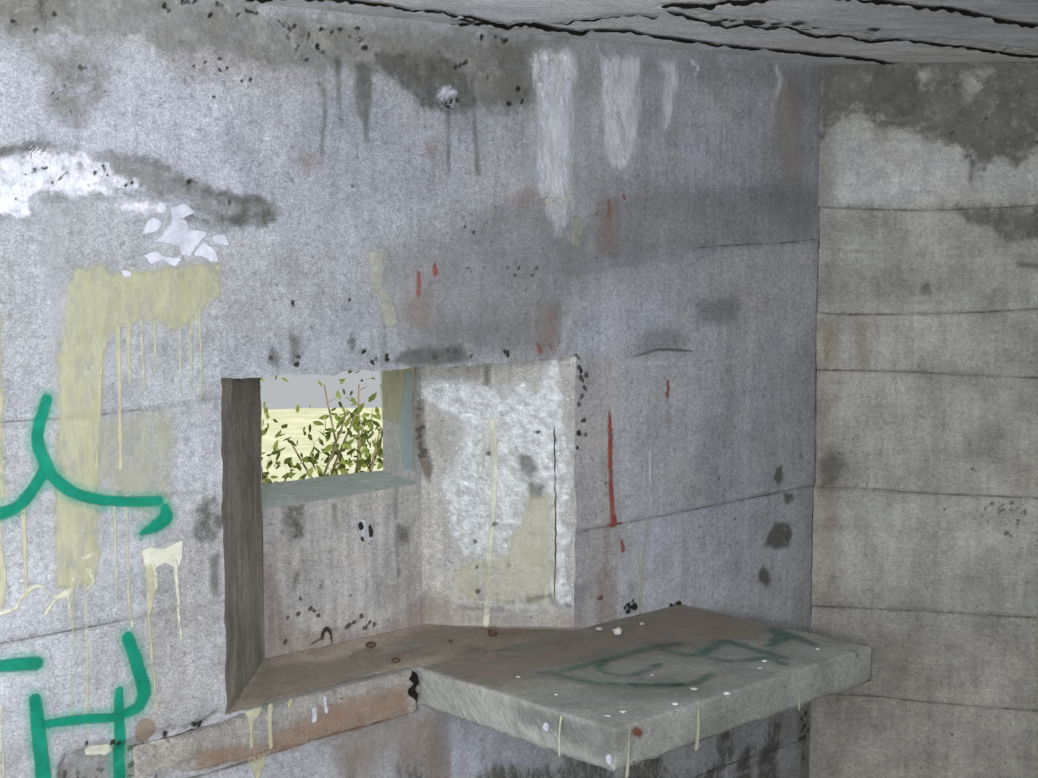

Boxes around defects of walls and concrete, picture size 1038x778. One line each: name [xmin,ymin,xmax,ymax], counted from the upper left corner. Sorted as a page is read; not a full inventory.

crack [246,0,1038,65]
spalling [0,142,50,161]
damp [0,147,166,218]
peeling [78,158,275,266]
damp [375,51,475,110]
damp [530,48,576,235]
damp [600,54,640,172]
damp [660,60,679,129]
damp [820,61,1038,171]
damp [956,205,1038,239]
damp [487,757,662,778]
damp [705,722,780,778]